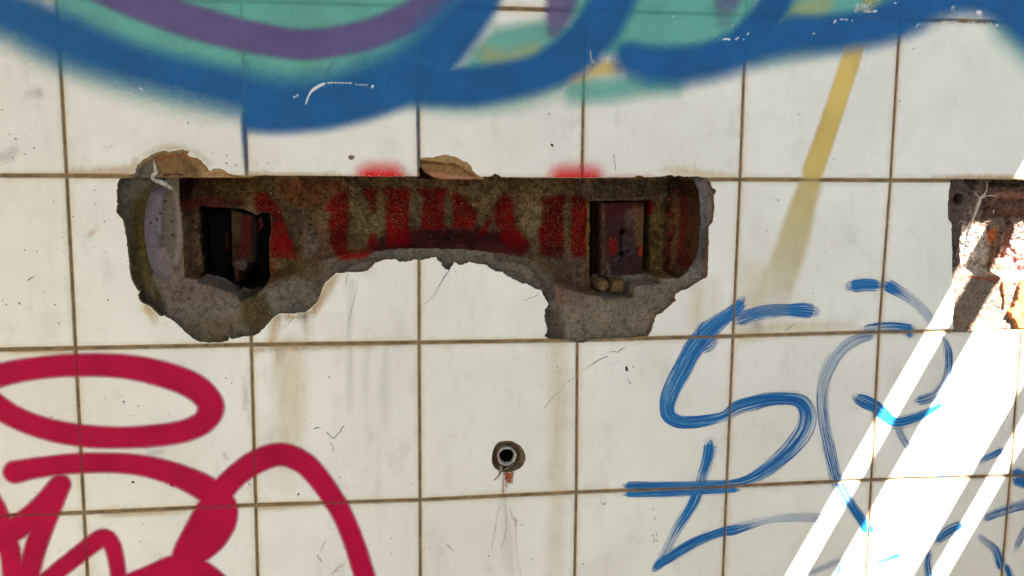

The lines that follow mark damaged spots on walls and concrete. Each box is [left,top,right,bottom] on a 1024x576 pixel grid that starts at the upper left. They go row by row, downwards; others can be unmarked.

spalling [118,144,713,342]
spalling [948,179,1024,332]
corrosion [492,472,521,576]